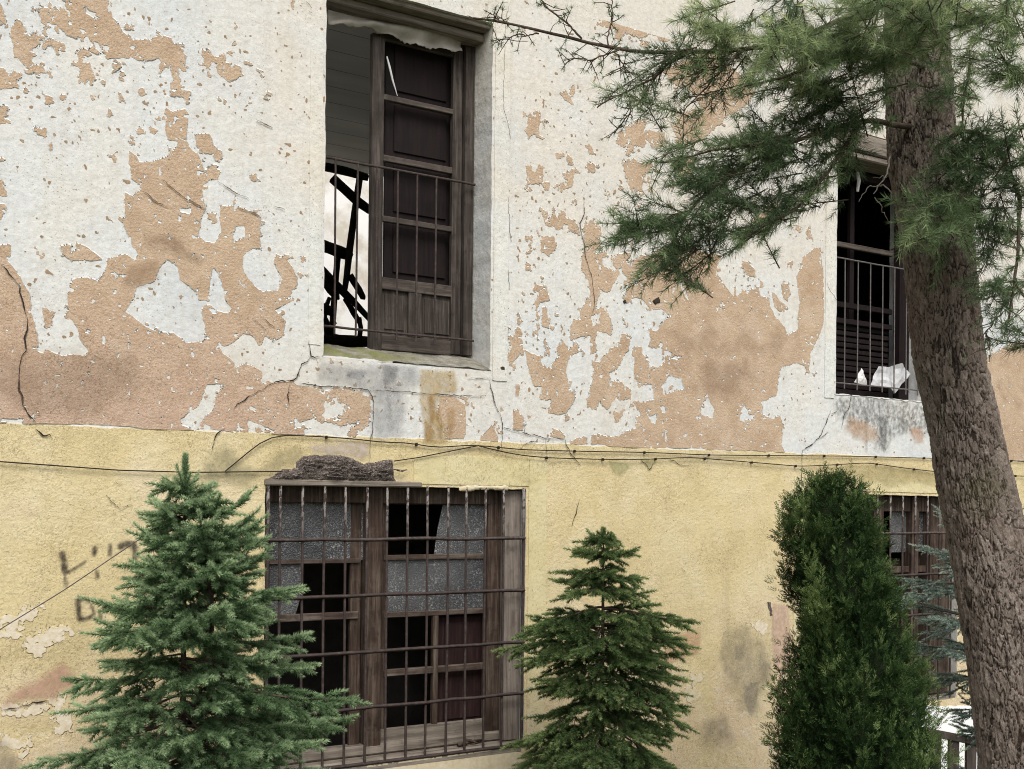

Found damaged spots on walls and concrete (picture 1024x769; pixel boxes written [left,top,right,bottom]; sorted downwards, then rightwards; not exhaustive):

peeling [0,0,833,453]
crack [1,264,51,437]
crack [235,344,580,465]
crack [801,395,852,487]
damp [837,398,926,449]
spalling [0,599,81,659]
spalling [0,733,34,761]
spalling [0,692,76,739]